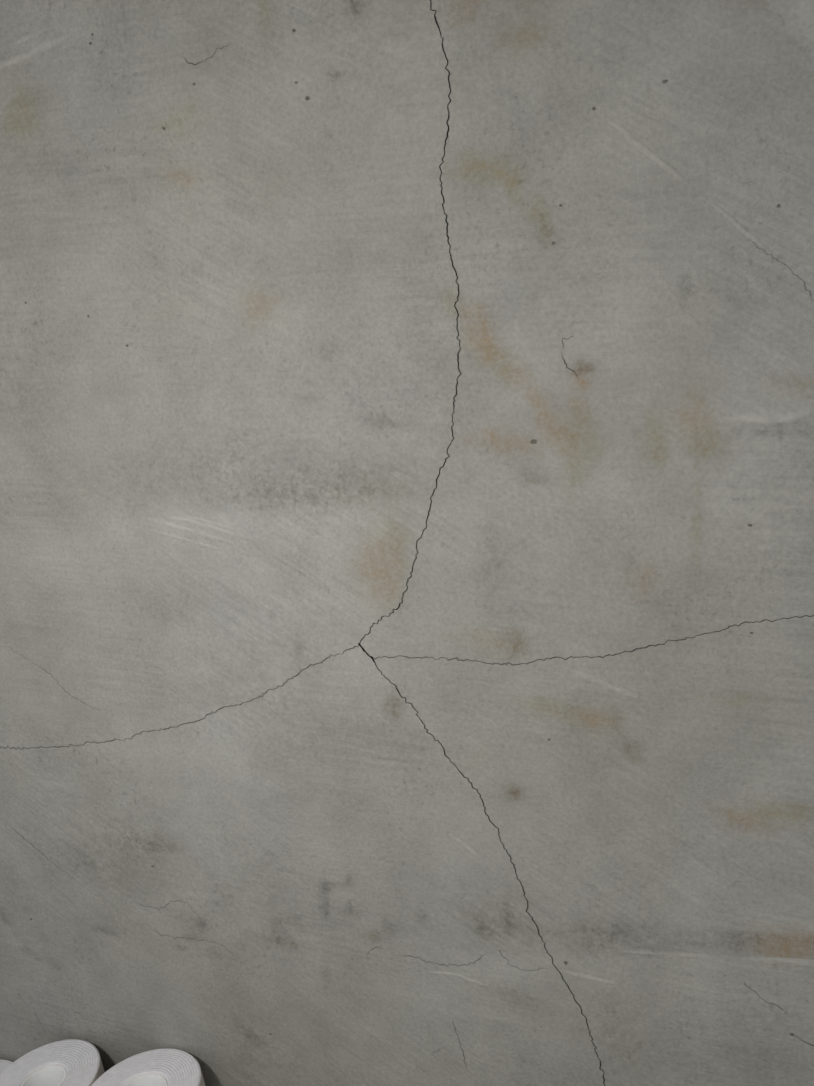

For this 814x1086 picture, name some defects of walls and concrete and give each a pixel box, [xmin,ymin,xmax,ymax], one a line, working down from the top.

crack [430,0,459,320]
crack [1,328,814,1086]